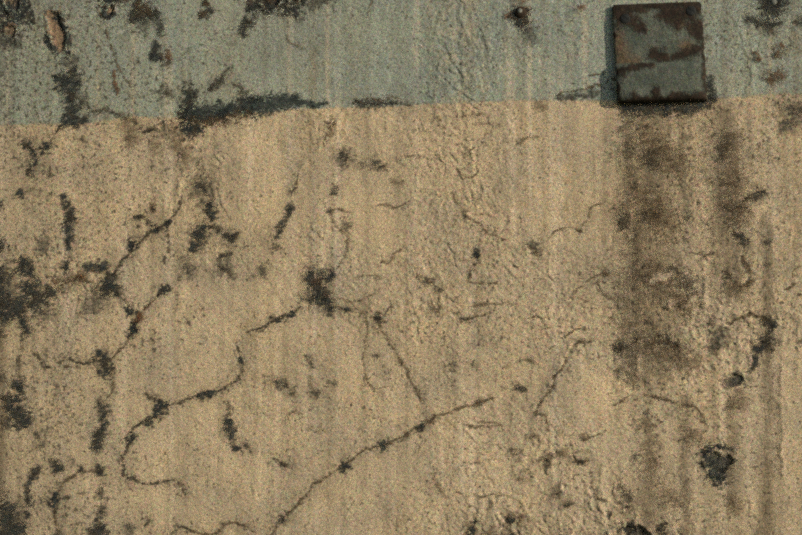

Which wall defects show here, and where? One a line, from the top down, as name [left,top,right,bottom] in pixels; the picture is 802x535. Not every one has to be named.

mould [124,0,173,66]
mould [198,0,214,19]
mould [53,56,181,133]
crack [22,126,60,176]
leakage [0,237,66,337]
leakage [60,192,78,275]
crack [17,201,182,398]
crack [451,192,516,307]
leakage [0,375,75,535]
crack [45,307,300,533]
crack [172,248,503,535]
crack [504,340,592,432]